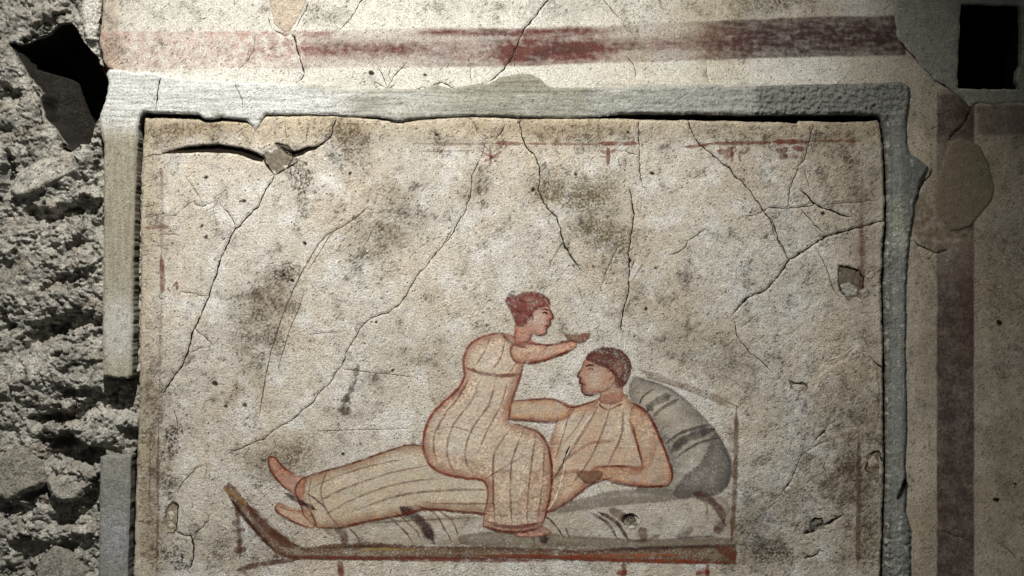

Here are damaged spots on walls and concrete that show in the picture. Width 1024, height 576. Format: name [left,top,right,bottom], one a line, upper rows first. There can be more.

spalling [11,22,109,151]
spalling [257,142,314,194]
crack [144,172,274,435]
crack [230,117,652,515]
crack [688,121,887,373]
spalling [837,265,875,300]
spalling [622,513,642,529]
crack [775,430,833,499]